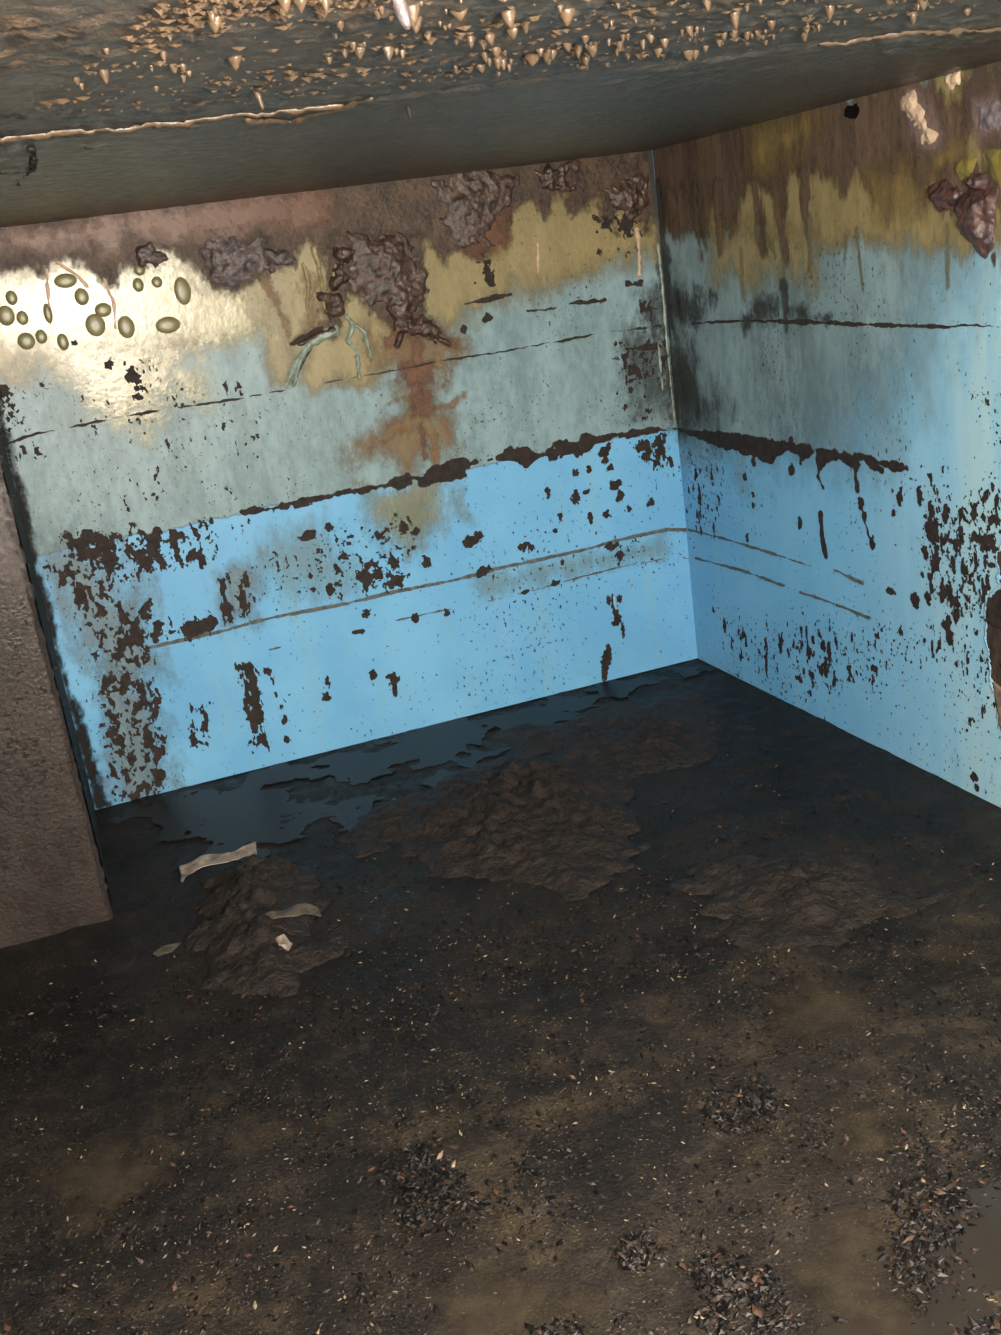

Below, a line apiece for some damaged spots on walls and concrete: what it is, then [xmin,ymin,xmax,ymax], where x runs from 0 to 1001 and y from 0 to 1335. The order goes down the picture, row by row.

damp [945,71,961,91]
rust [262,274,324,340]
rust [352,328,469,537]
damp [0,84,1001,809]
peeling [462,531,484,548]
peeling [470,562,495,583]
peeling [517,542,534,553]
peeling [712,458,1001,732]